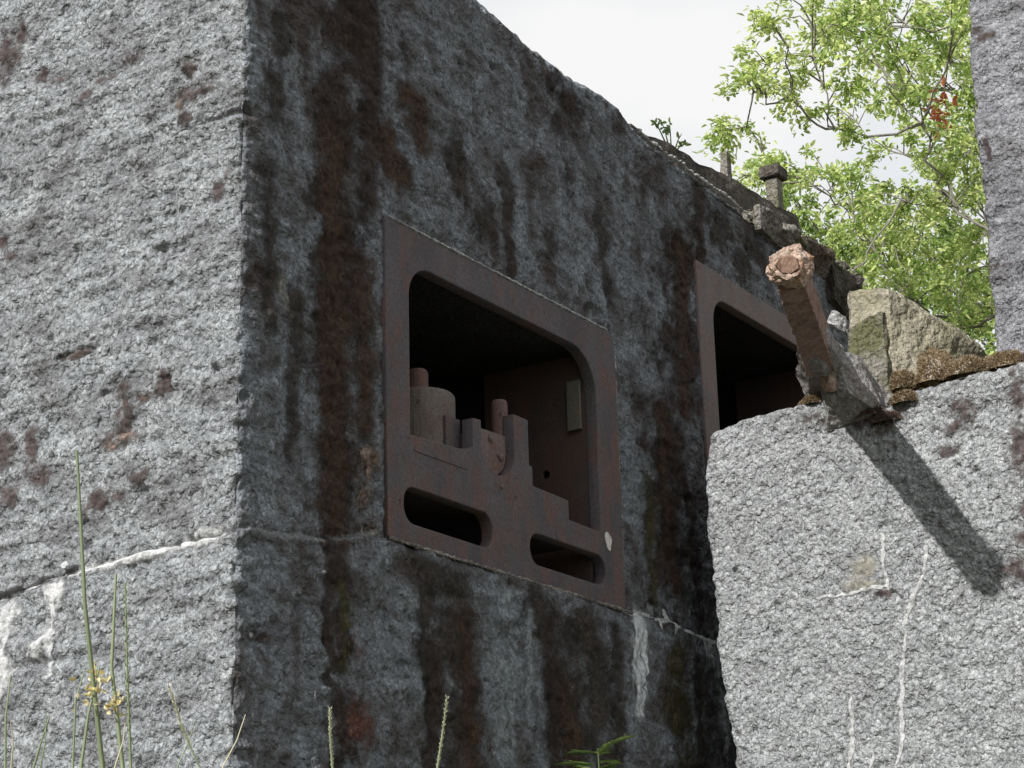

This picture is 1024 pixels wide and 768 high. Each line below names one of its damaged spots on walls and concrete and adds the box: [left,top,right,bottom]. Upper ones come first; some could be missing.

damp [266,6,292,132]
damp [260,159,306,461]
damp [444,129,467,197]
damp [473,162,517,282]
damp [595,203,613,308]
rust [308,0,430,768]
crack [0,528,225,600]
damp [0,599,21,698]
damp [30,581,63,679]
damp [413,558,649,768]
damp [664,638,730,768]
crack [816,534,928,768]